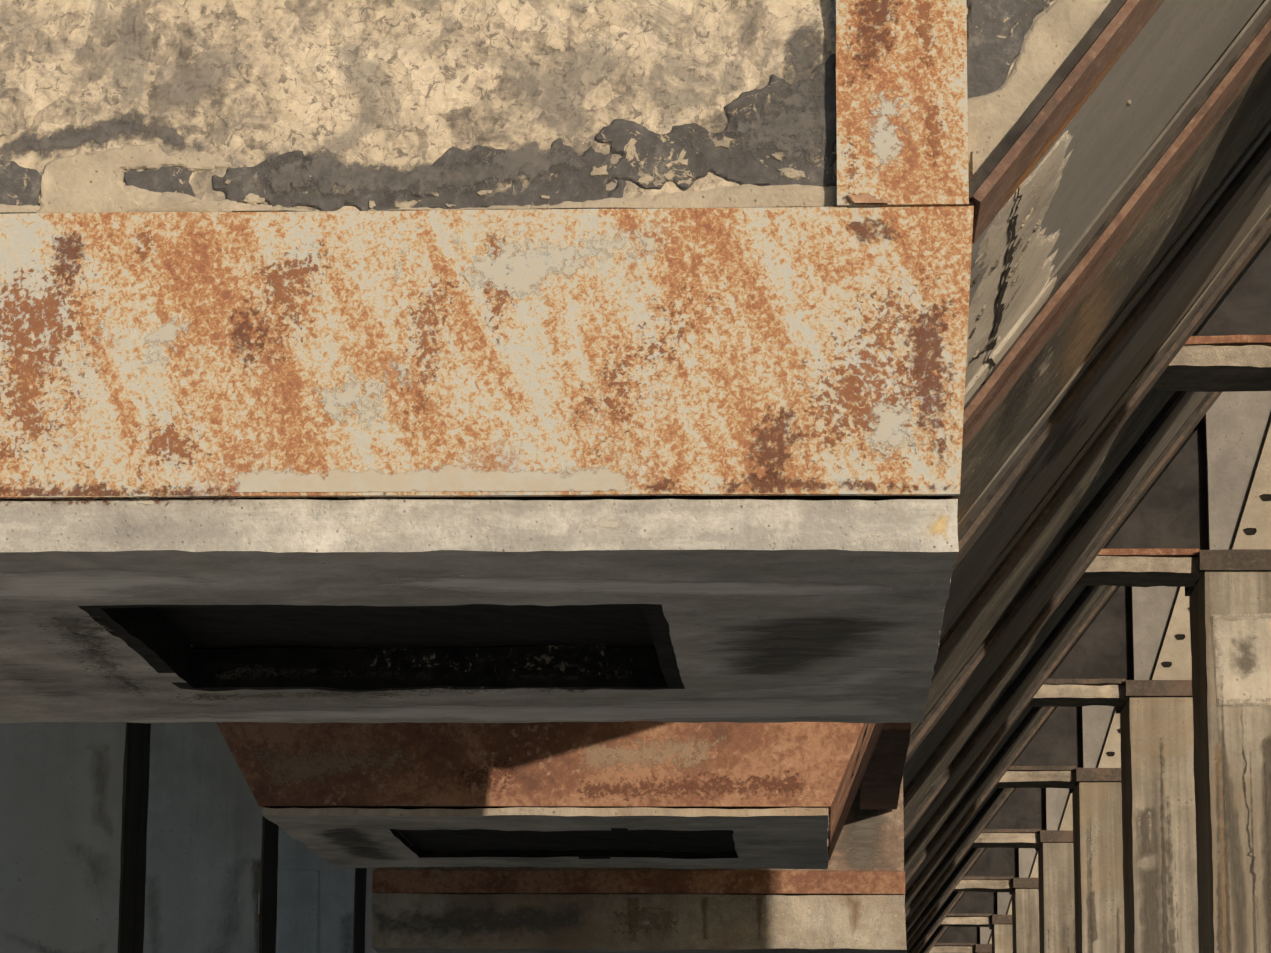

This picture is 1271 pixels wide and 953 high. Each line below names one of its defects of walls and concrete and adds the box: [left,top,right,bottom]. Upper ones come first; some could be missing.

peeling [0,53,888,214]
peeling [966,0,1113,183]
rust [0,231,103,469]
rust [0,410,235,506]
rust [230,241,331,372]
rust [396,275,464,433]
rust [574,275,727,464]
rust [724,241,1110,499]
crack [967,187,1024,385]
peeling [964,130,1074,406]
leakage [1138,780,1176,953]
leakage [1217,686,1271,953]